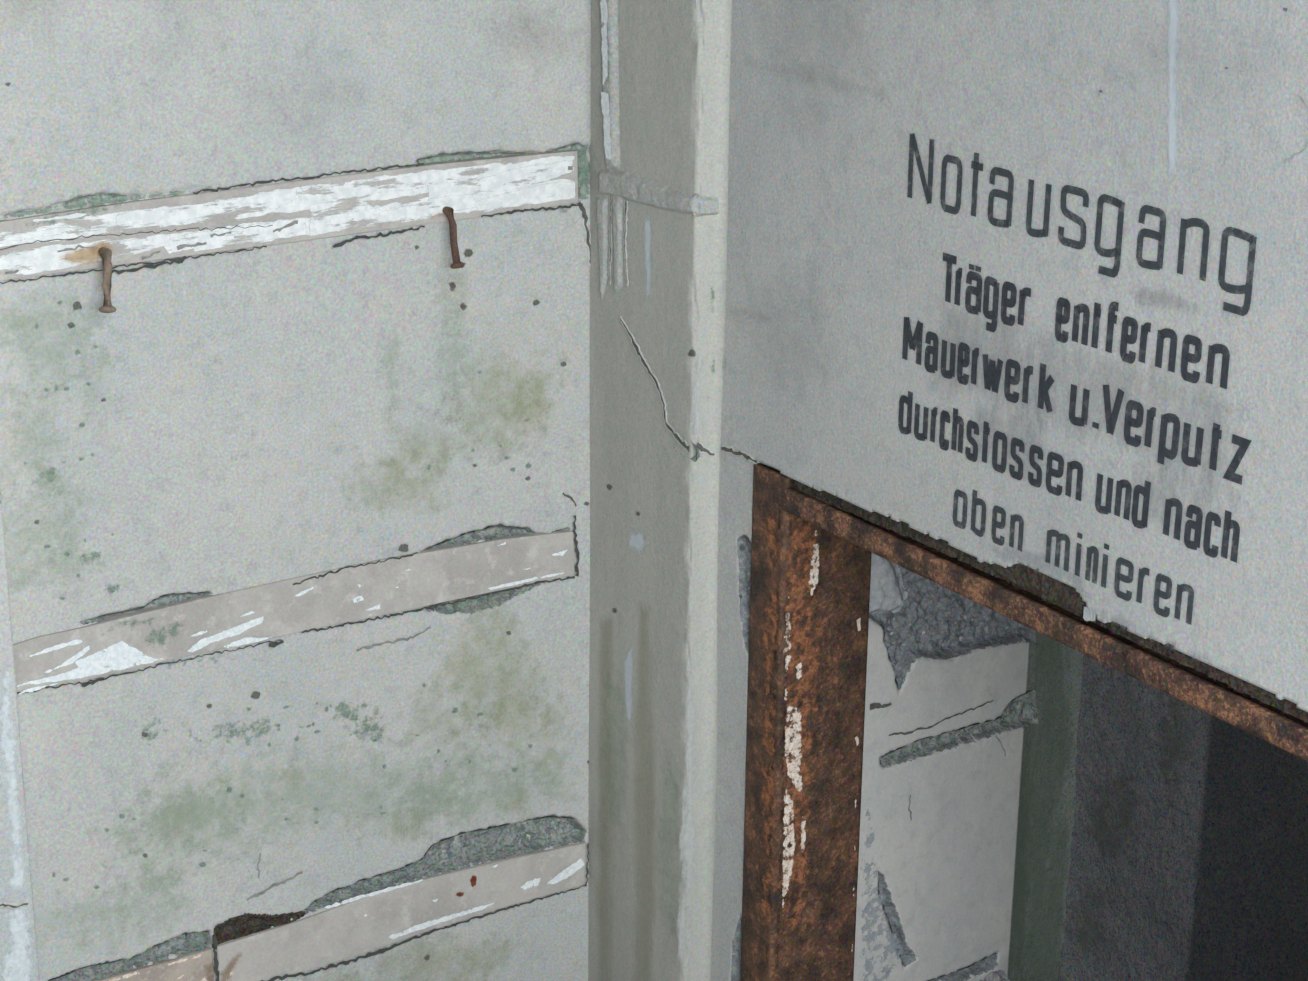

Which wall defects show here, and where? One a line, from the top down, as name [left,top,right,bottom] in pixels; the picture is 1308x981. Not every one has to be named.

crack [0,220,298,284]
peeling [0,143,590,275]
crack [193,163,424,195]
crack [333,226,425,248]
crack [481,195,757,465]
spalling [427,567,565,614]
spalling [773,468,1308,722]
peeling [0,592,211,981]
rust [761,515,821,934]
peeling [782,597,806,907]
spalling [880,690,1039,768]
spalling [48,816,587,981]